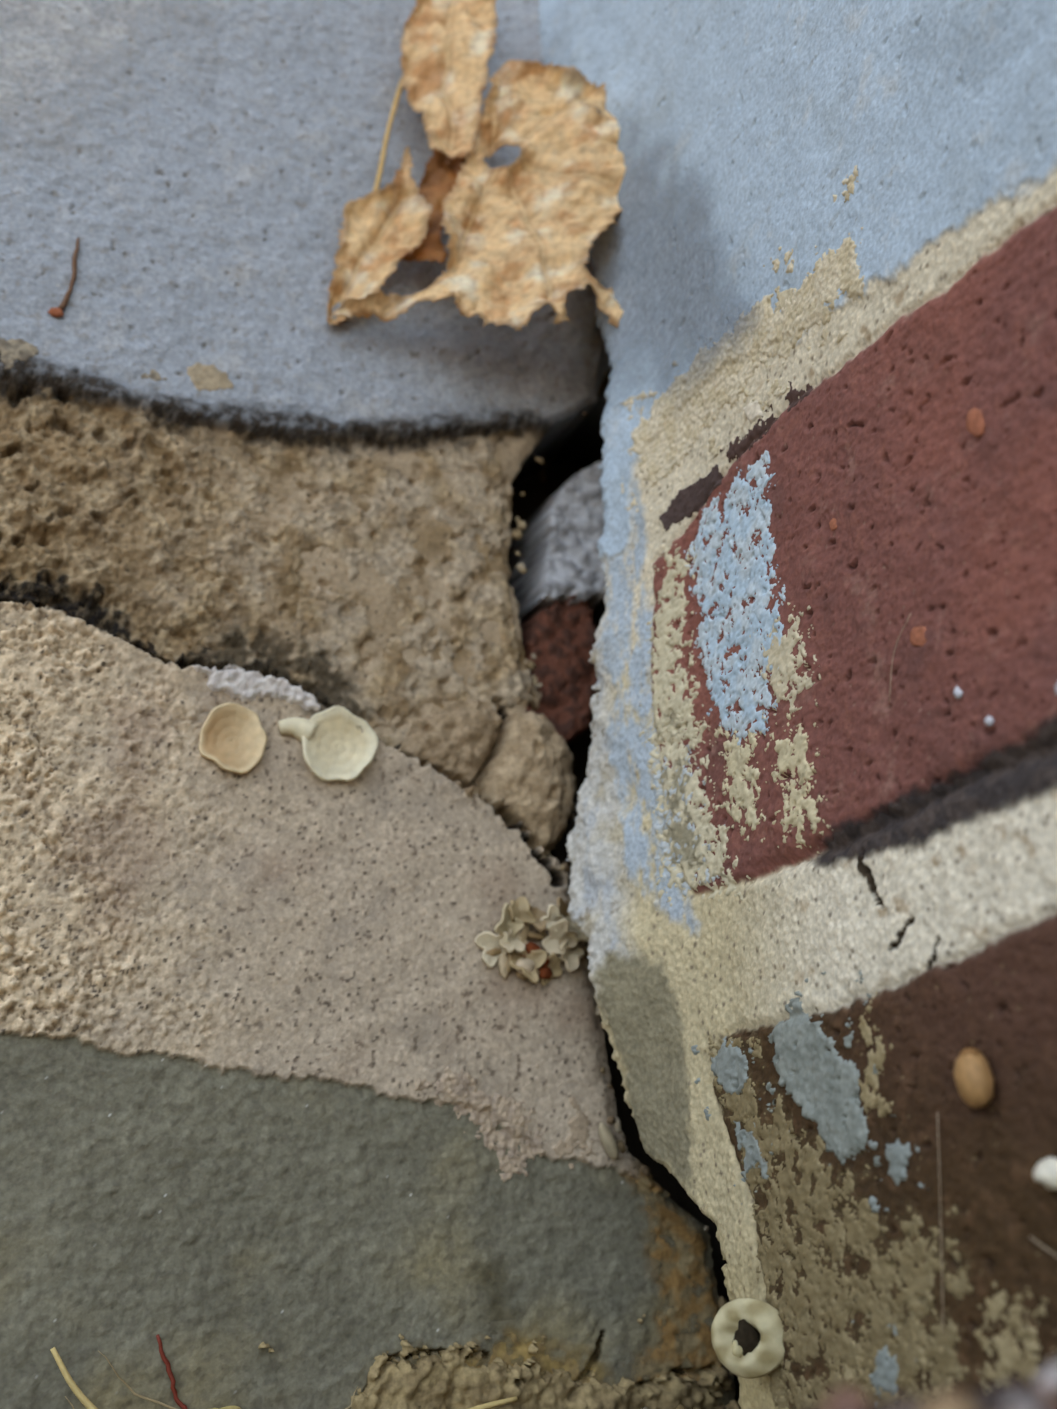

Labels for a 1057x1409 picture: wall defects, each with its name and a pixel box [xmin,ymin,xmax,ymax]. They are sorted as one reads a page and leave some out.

peeling [833,165,859,203]
peeling [0,338,39,369]
peeling [187,362,234,391]
crack [508,366,612,689]
spalling [0,387,606,753]
peeling [620,227,865,912]
crack [140,628,212,669]
crack [506,822,569,887]
crack [857,856,940,969]
peeling [691,970,1055,1409]
crack [387,1348,489,1362]
crack [582,1331,604,1376]